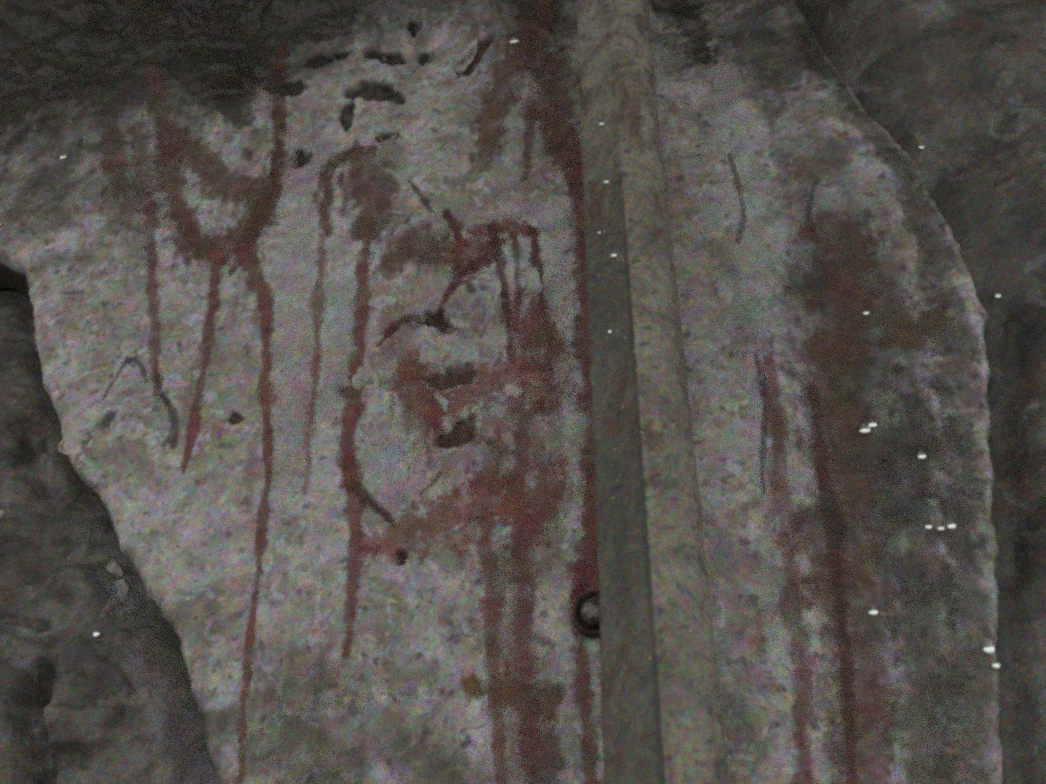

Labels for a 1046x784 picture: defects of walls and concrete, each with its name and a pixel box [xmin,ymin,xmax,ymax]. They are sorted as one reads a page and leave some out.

corrosion [142,40,296,784]
corrosion [306,318,321,426]
corrosion [312,0,601,784]